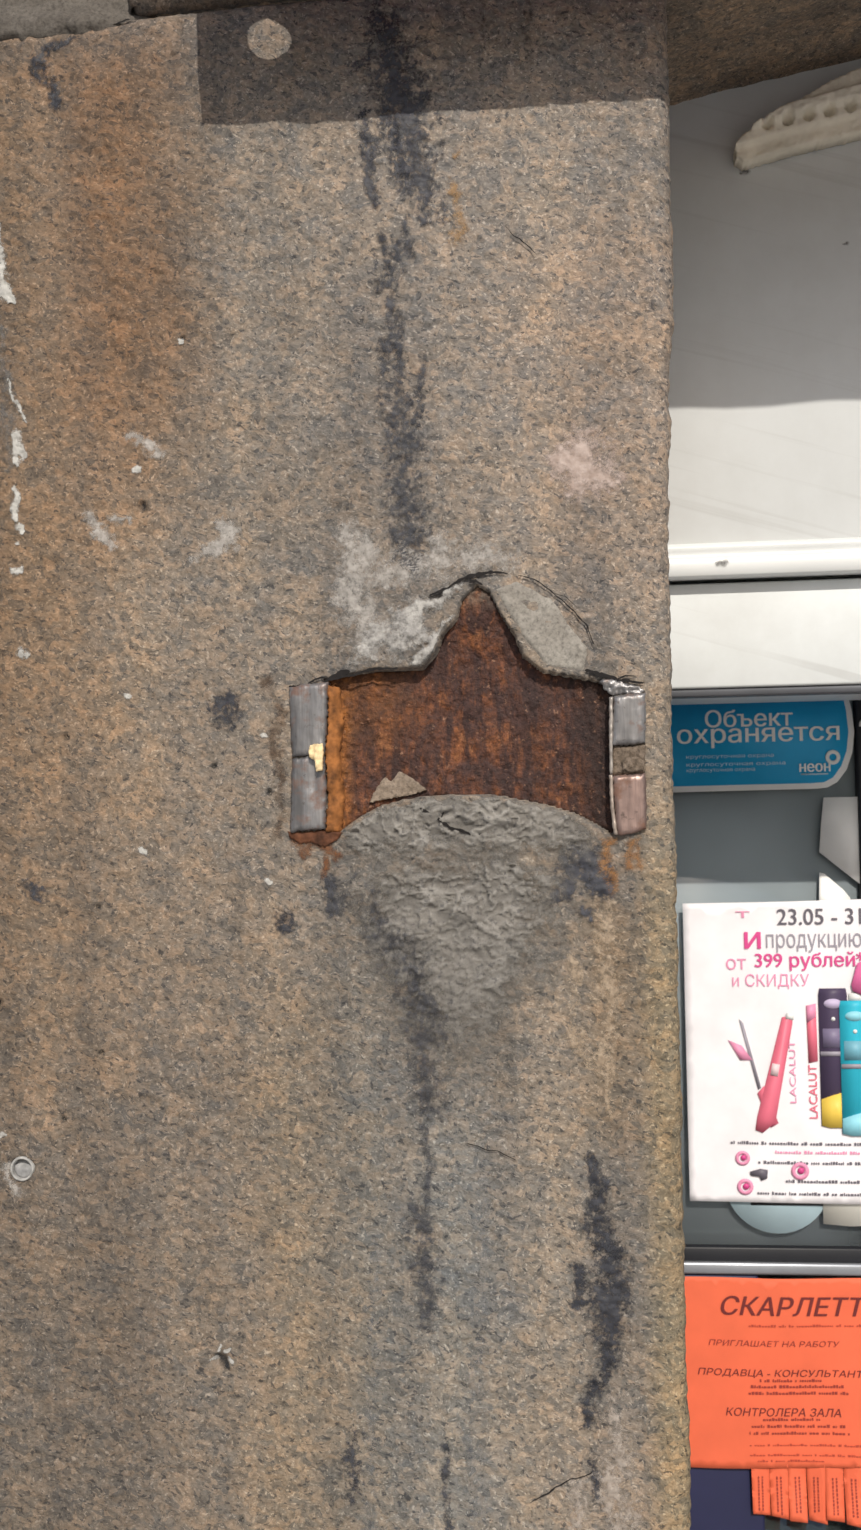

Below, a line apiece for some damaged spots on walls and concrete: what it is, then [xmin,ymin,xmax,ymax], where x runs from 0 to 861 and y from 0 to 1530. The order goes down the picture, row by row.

water stain [333,0,519,645]
peeling [355,584,462,666]
crack [428,570,644,684]
water stain [569,1151,632,1428]
water stain [587,1457,604,1501]